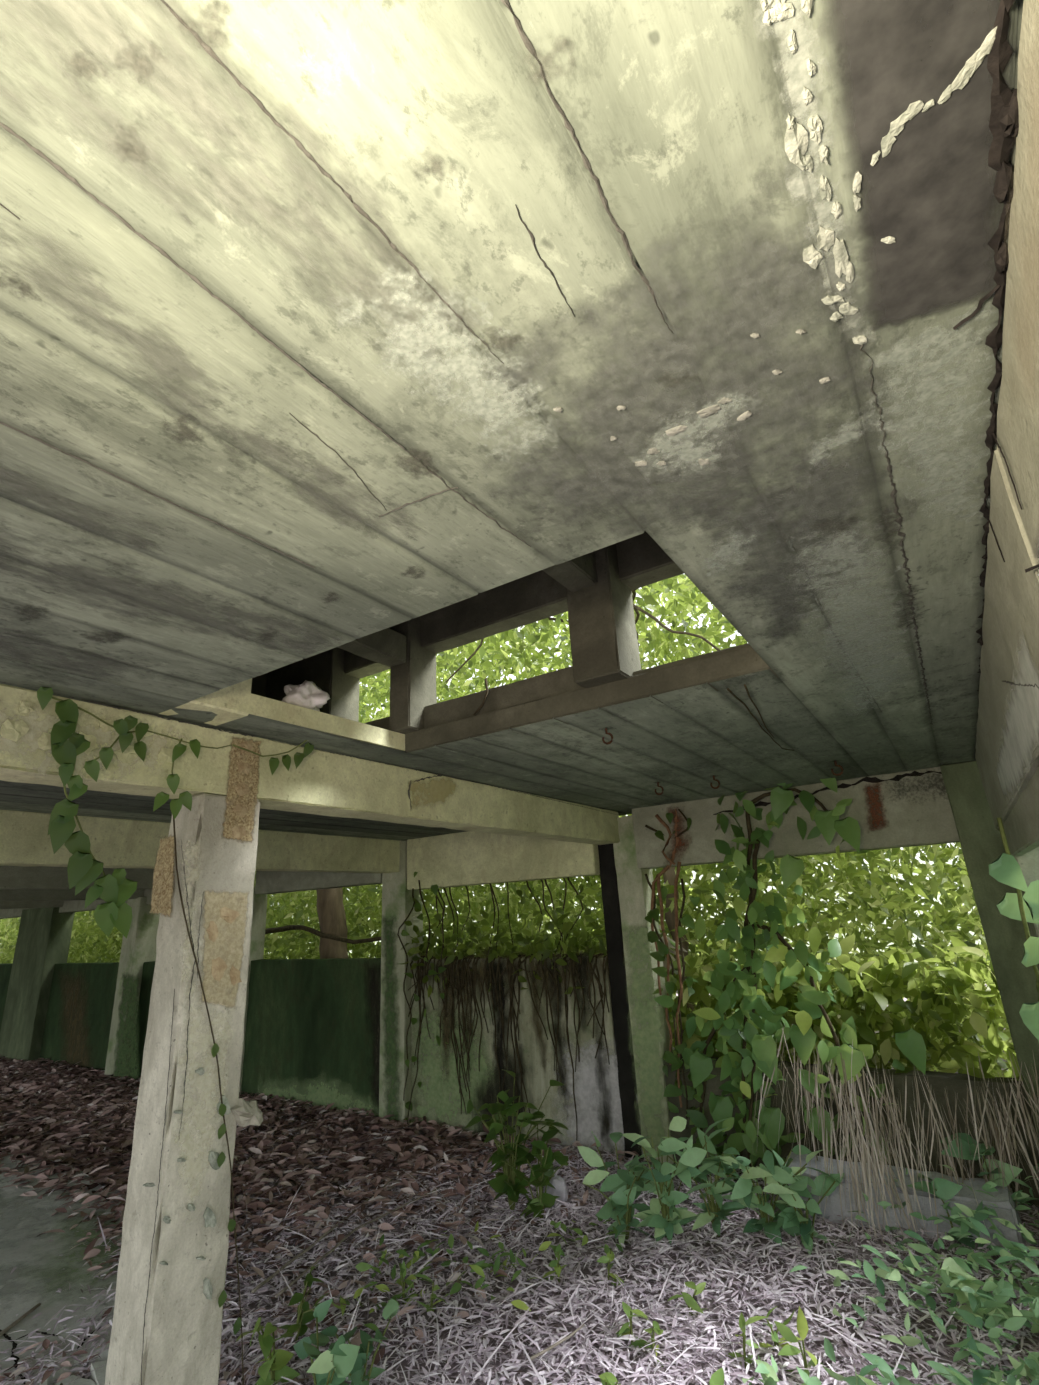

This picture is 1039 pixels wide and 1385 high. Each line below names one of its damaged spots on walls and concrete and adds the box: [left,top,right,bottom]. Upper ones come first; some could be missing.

water stain [9,0,256,152]
water stain [187,148,335,240]
crack [0,122,531,568]
crack [160,0,504,364]
crack [501,0,673,333]
water stain [348,0,1001,710]
spalling [635,397,752,467]
peeling [852,335,867,345]
peeling [760,0,997,322]
crack [953,0,1039,708]
corrosion [865,783,886,831]
water stain [419,952,626,1152]